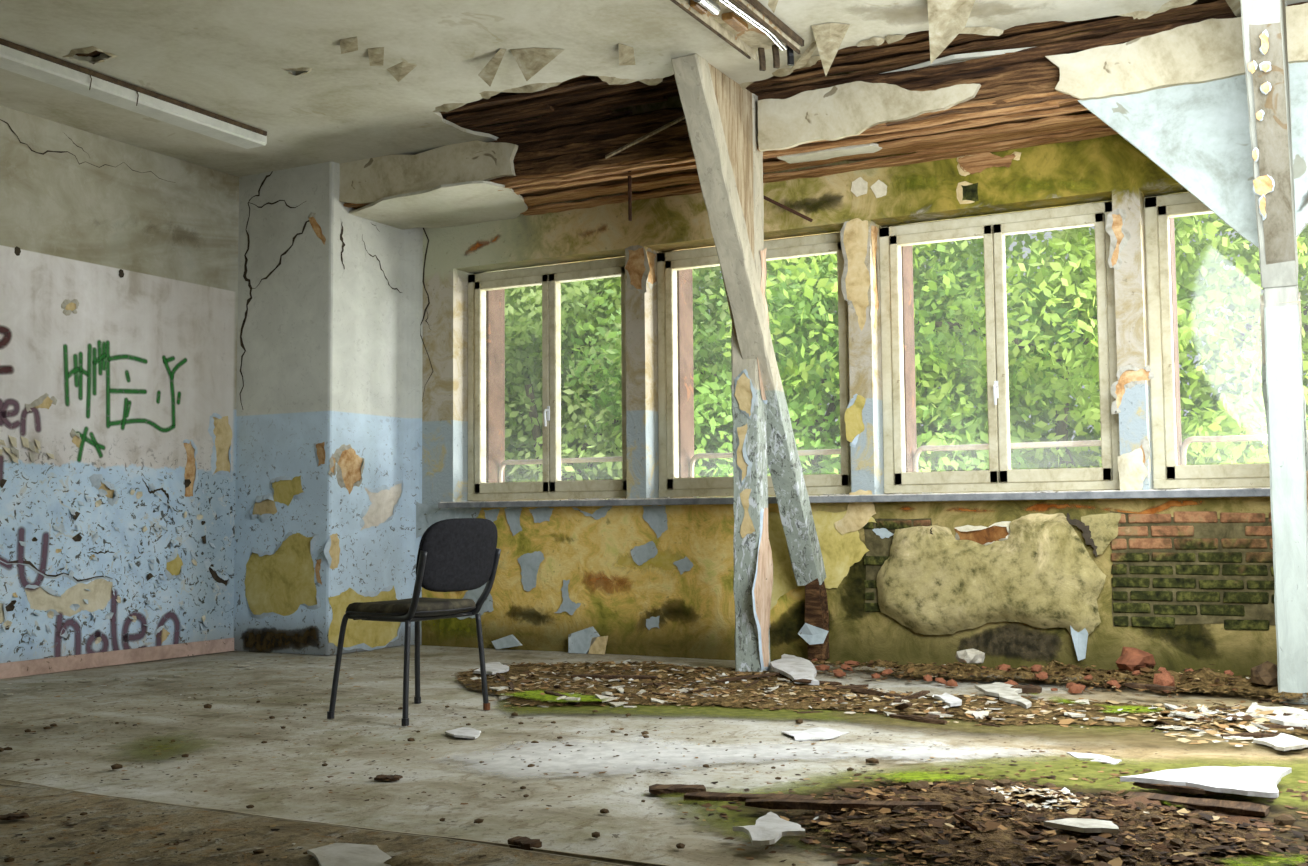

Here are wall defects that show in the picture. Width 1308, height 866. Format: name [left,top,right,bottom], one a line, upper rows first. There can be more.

peeling [432,48,565,112]
peeling [598,43,663,85]
peeling [772,23,906,77]
crack [0,119,176,183]
crack [240,171,309,409]
crack [340,224,433,401]
peeling [25,393,57,413]
peeling [0,413,403,651]
flaking render [954,521,1011,545]
flaking render [863,518,932,613]
flaking render [1110,511,1275,630]
flaking render [958,624,1088,661]